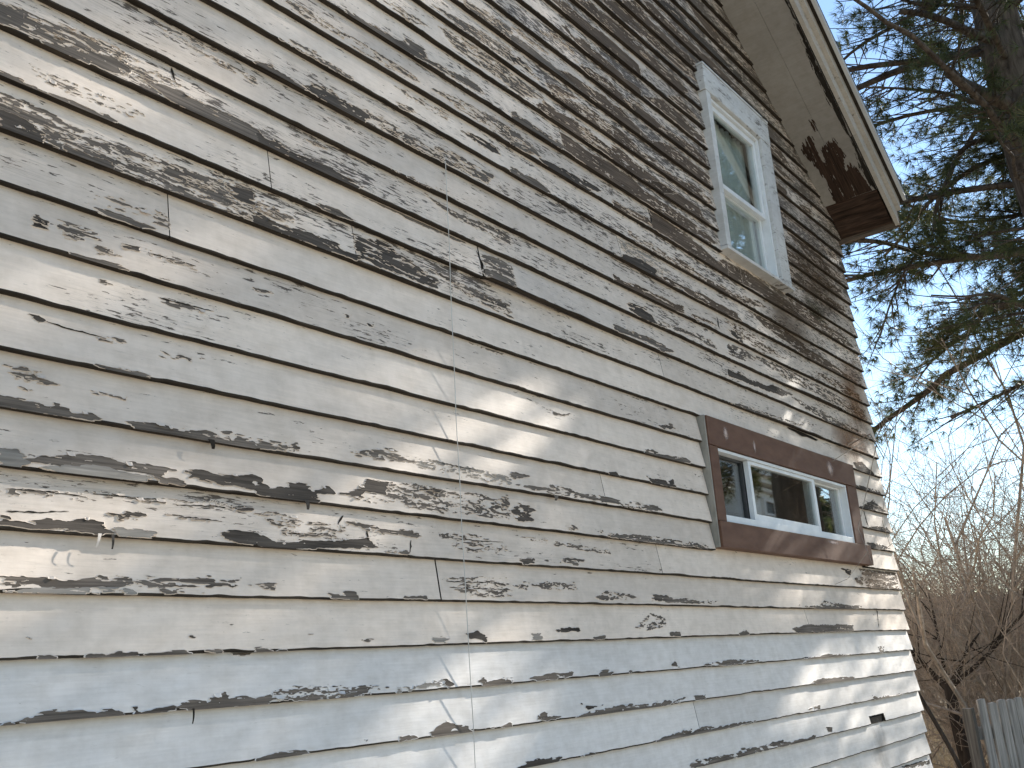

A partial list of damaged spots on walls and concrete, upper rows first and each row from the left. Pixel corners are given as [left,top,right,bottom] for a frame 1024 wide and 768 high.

peeling [0,2,495,245]
peeling [0,92,514,319]
peeling [278,0,877,439]
peeling [0,447,663,555]
peeling [0,574,278,595]
peeling [442,576,577,598]
peeling [596,590,637,601]
peeling [635,593,717,637]
peeling [792,623,854,633]
peeling [0,678,455,726]
peeling [689,726,833,768]